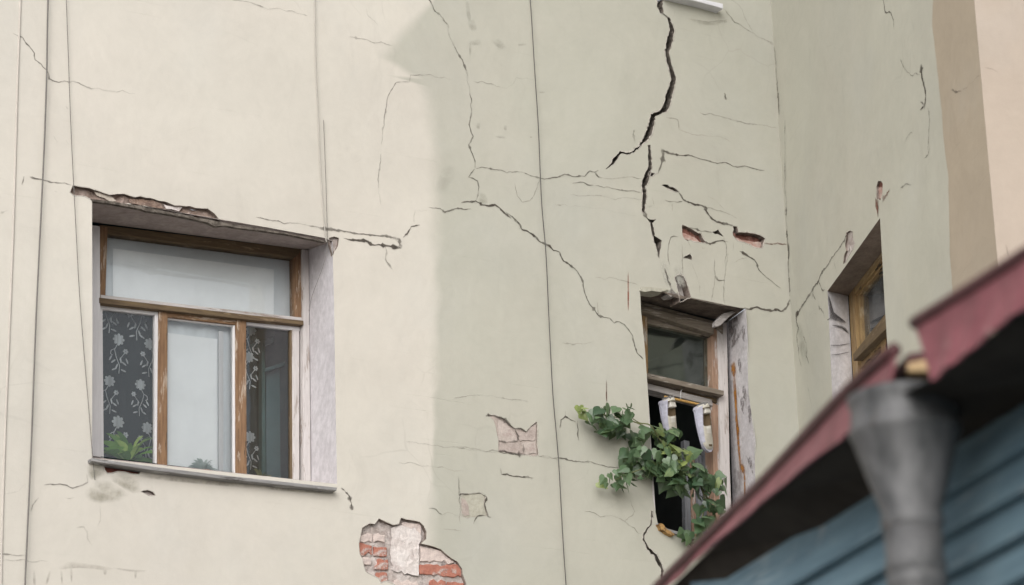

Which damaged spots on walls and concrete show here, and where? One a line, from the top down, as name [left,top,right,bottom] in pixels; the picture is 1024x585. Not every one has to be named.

crack [919,66,927,109]
crack [525,0,848,355]
flaking render [70,186,220,222]
crack [323,225,419,249]
crack [443,96,642,358]
flaking render [681,225,706,243]
flaking render [733,226,766,249]
peeling [487,414,539,457]
peeling [459,493,488,522]
flaking render [359,517,467,585]
crack [642,510,664,576]